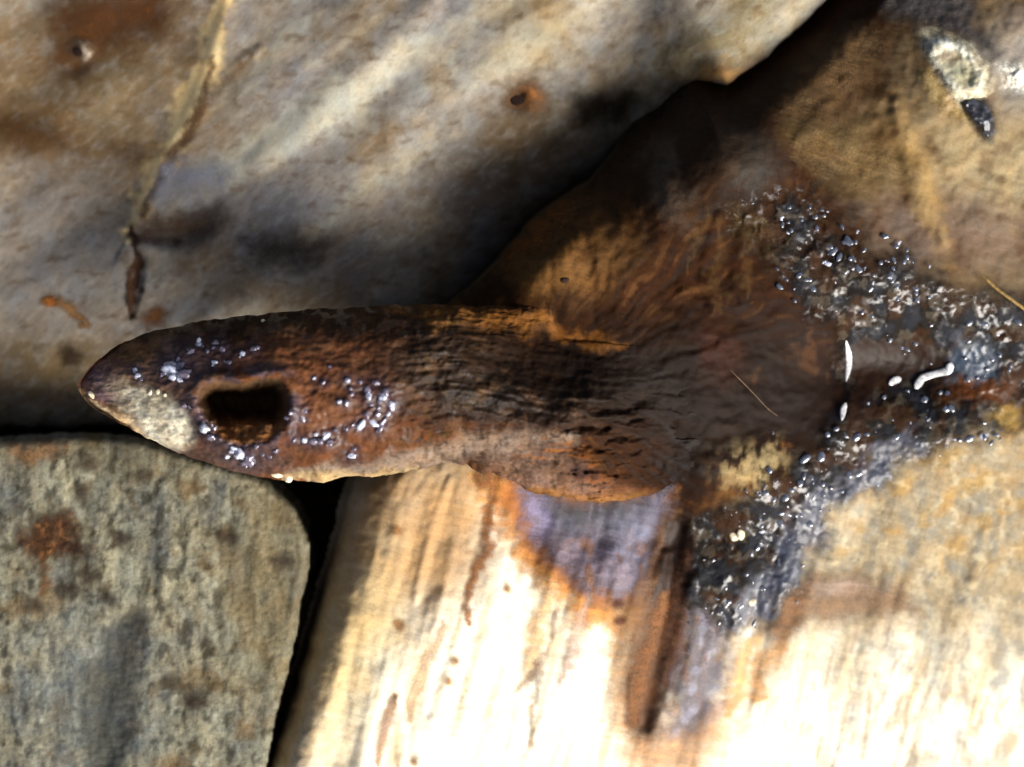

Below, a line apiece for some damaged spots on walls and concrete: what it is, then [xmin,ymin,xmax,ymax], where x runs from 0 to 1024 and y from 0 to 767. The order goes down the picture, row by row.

corrosion [144,307,167,329]
crack [125,58,221,319]
damp [449,0,919,767]